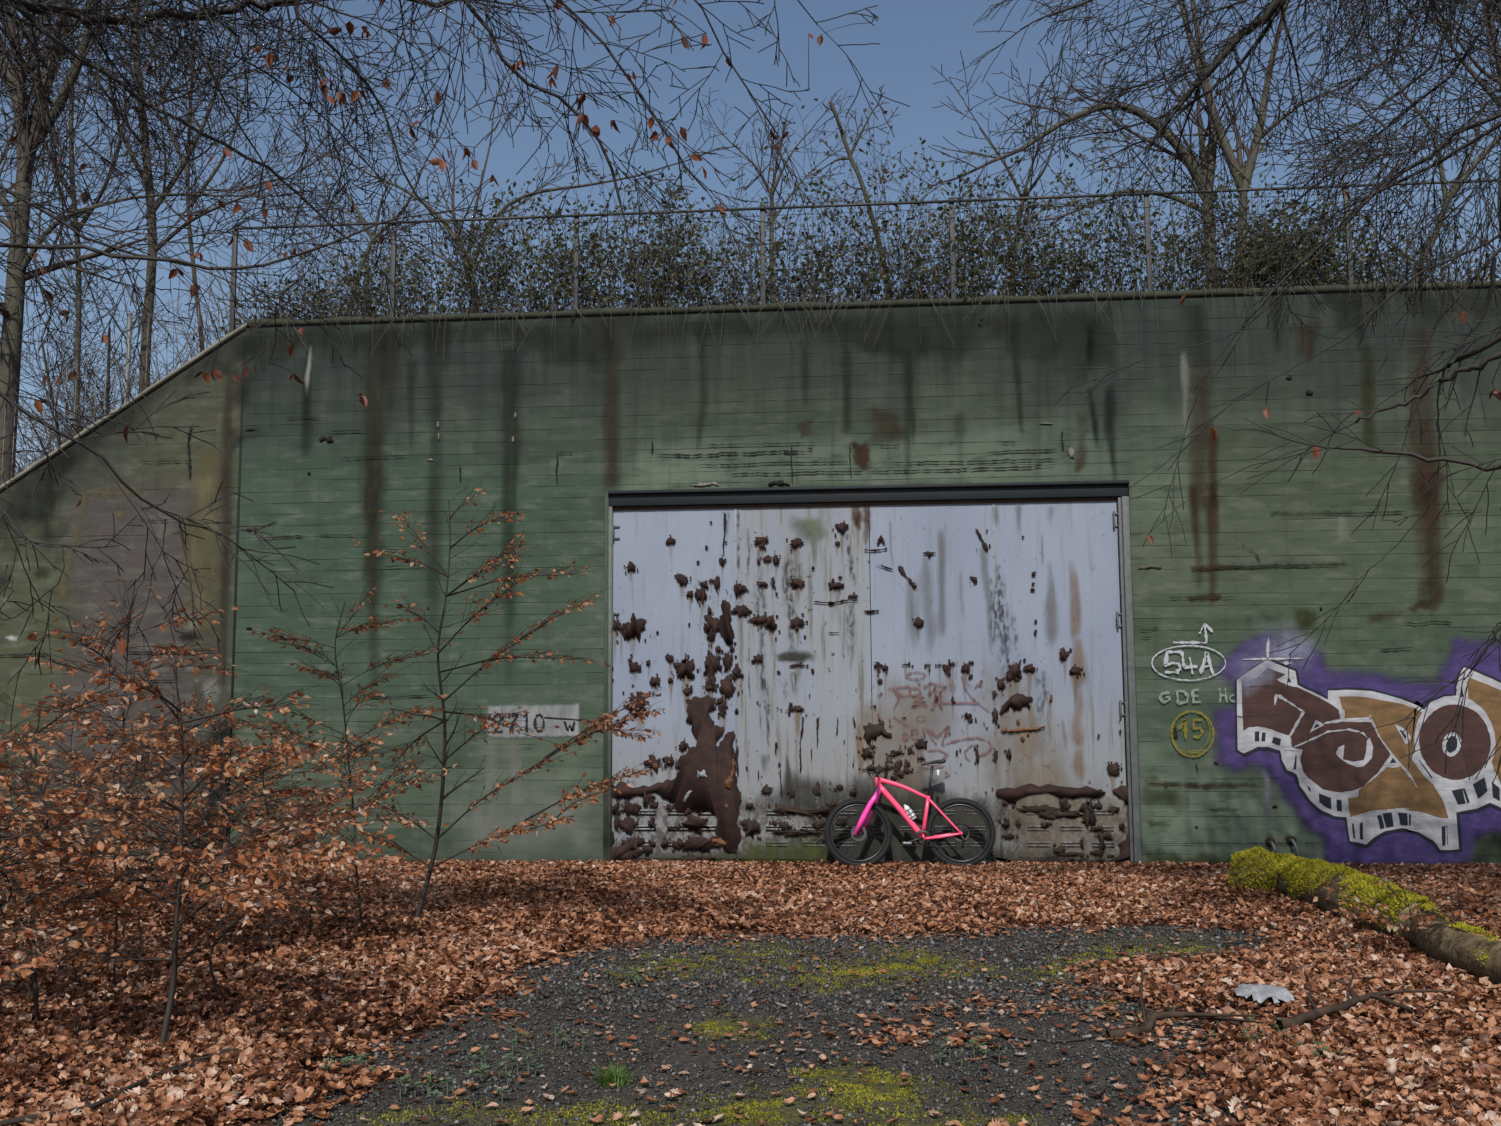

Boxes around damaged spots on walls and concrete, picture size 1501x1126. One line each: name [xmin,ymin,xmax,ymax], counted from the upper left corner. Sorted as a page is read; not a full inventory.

damp [783,311,1104,442]
damp [235,320,477,626]
damp [496,316,757,607]
corrosion [853,506,870,542]
corrosion [1073,578,1082,677]
corrosion [1003,704,1060,842]